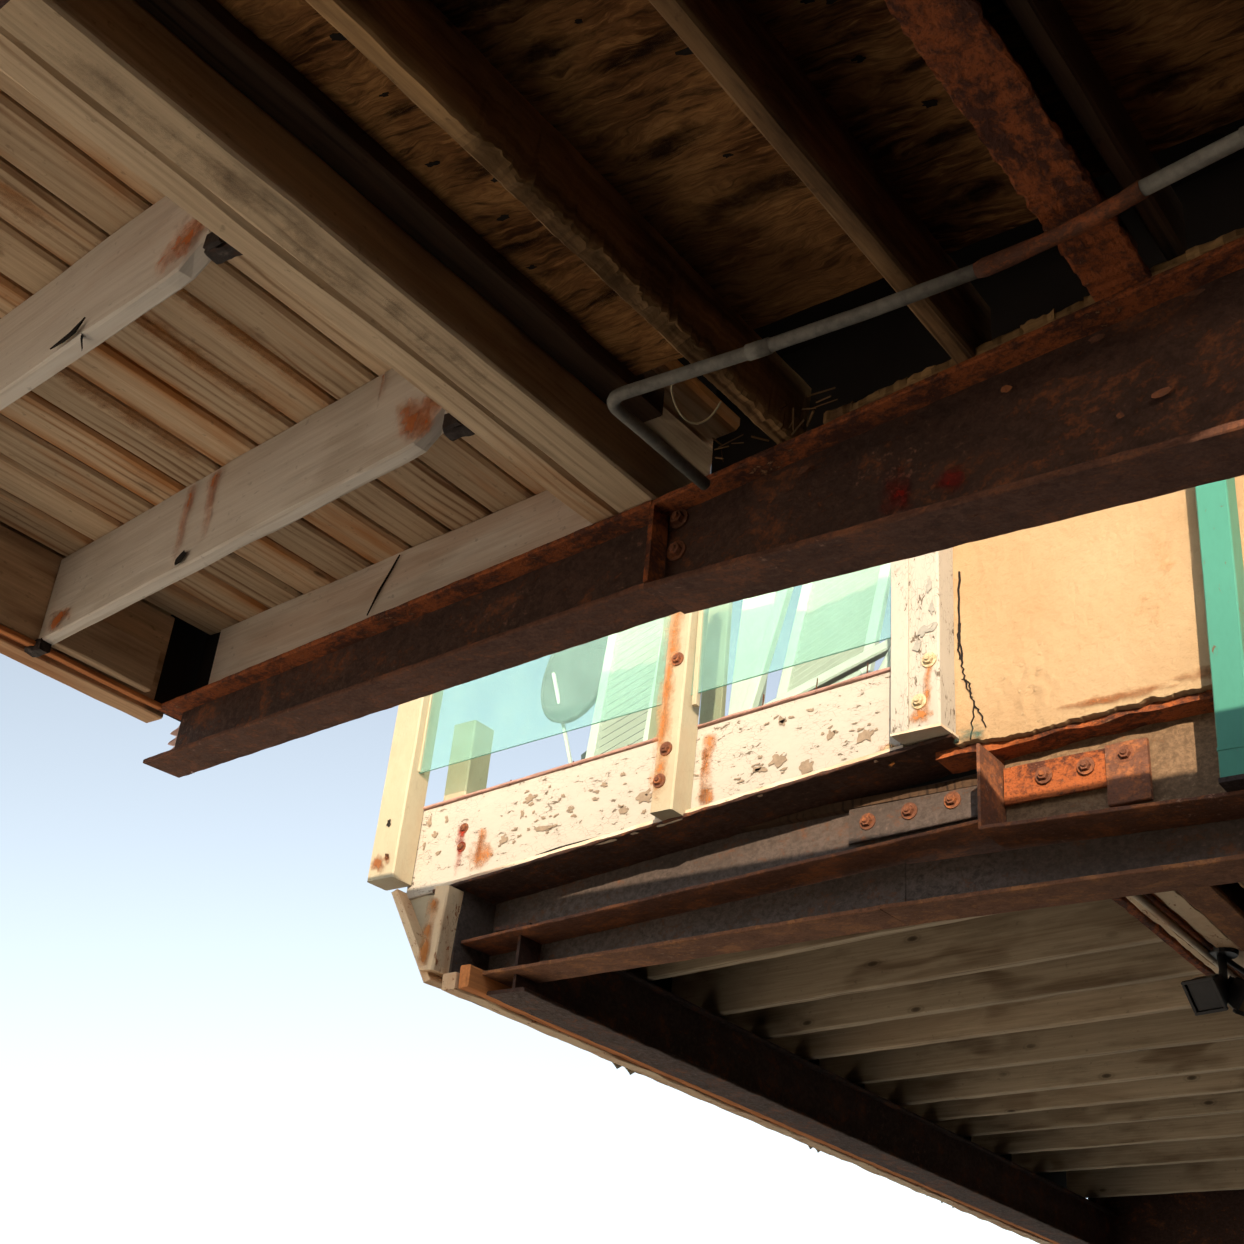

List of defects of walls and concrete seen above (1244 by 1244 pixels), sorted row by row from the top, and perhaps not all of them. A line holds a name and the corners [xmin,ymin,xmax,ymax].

crack [50,317,86,350]
corrosion [1151,387,1172,398]
corrosion [658,612,680,744]
corrosion [912,667,930,720]
peeling [764,708,814,726]
peeling [821,722,878,743]
corrosion [699,736,713,804]
peeling [734,752,814,783]
peeling [618,782,653,814]
peeling [490,785,577,856]
corrosion [458,829,490,866]